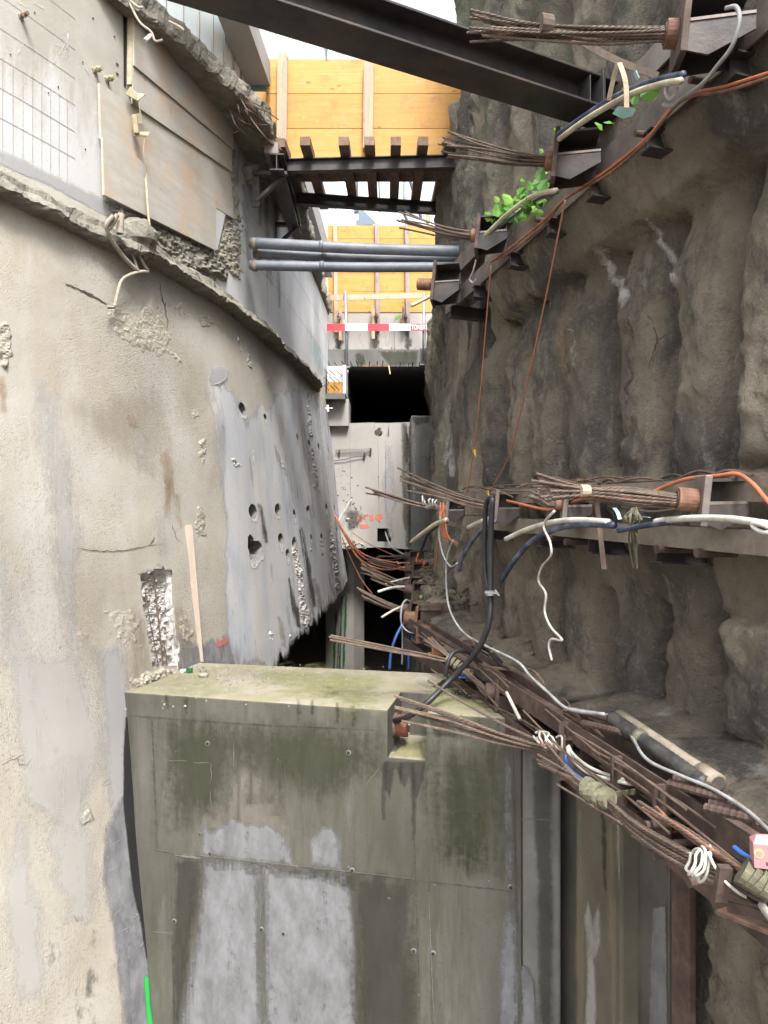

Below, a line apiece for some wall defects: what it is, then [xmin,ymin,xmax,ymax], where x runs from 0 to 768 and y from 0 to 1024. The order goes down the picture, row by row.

spalling [0,93,279,282]
spalling [0,322,14,369]
spalling [66,284,224,363]
crack [78,525,179,552]
peeling [128,366,366,688]
water stain [288,578,300,627]
water stain [300,528,316,607]
water stain [382,762,424,831]
water stain [444,757,513,878]
water stain [172,727,413,1024]